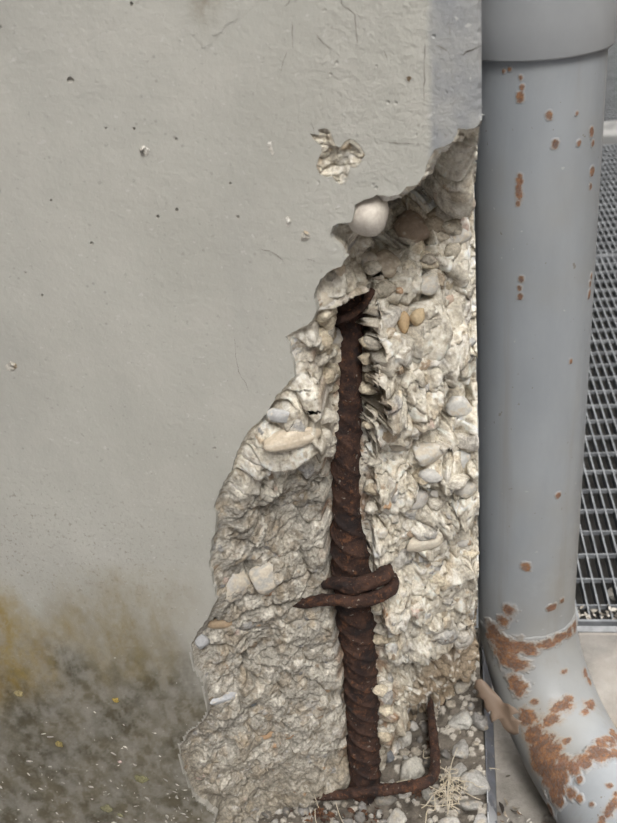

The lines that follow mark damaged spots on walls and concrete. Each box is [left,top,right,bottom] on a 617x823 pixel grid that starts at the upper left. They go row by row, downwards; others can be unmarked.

spalling [163,106,484,823]
leakage [0,659,215,823]
rust [290,802,384,823]